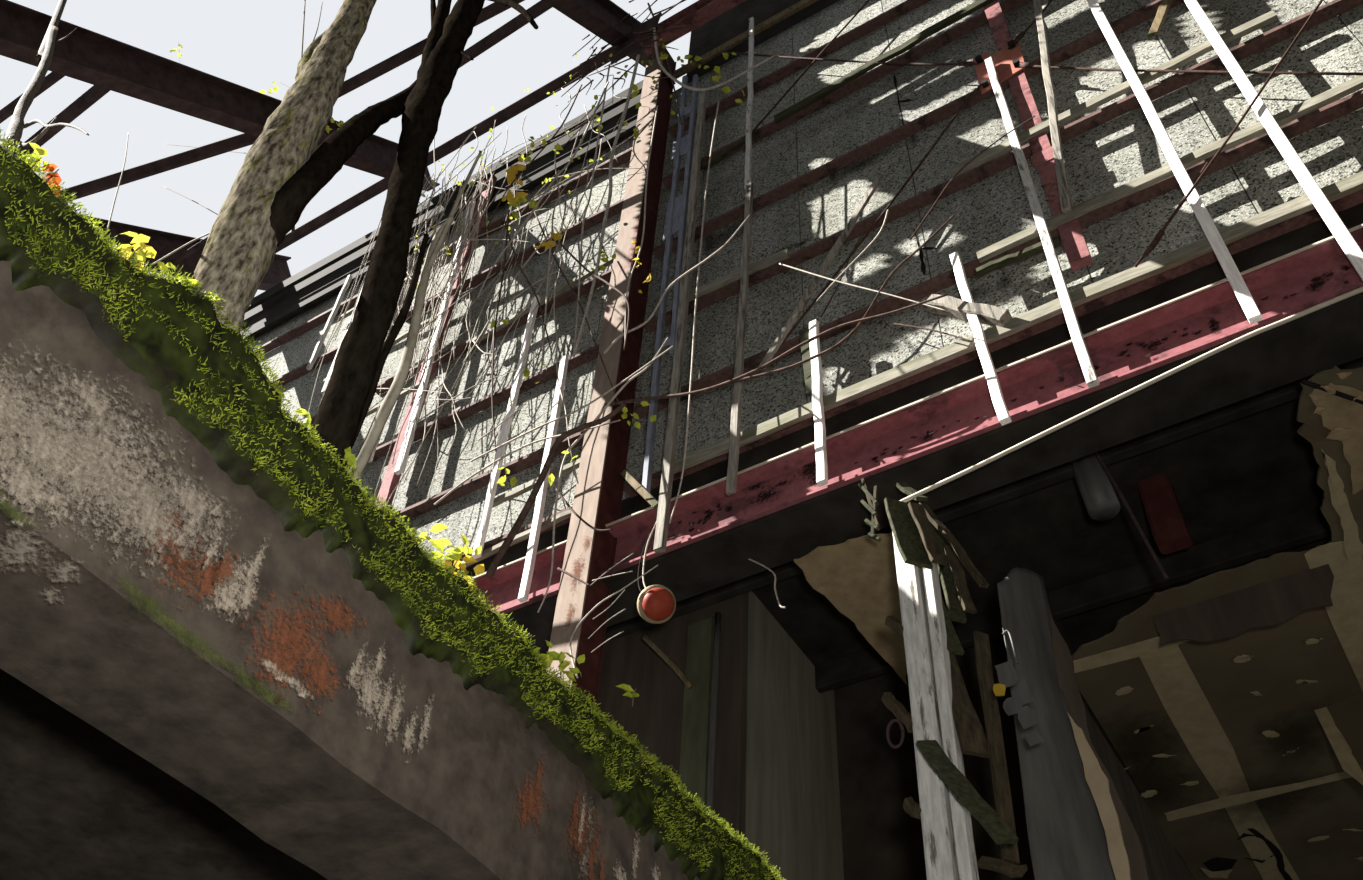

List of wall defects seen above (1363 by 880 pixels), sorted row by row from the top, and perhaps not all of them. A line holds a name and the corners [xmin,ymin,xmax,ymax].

flaking render [1308,372,1363,560]
water stain [349,645,432,763]